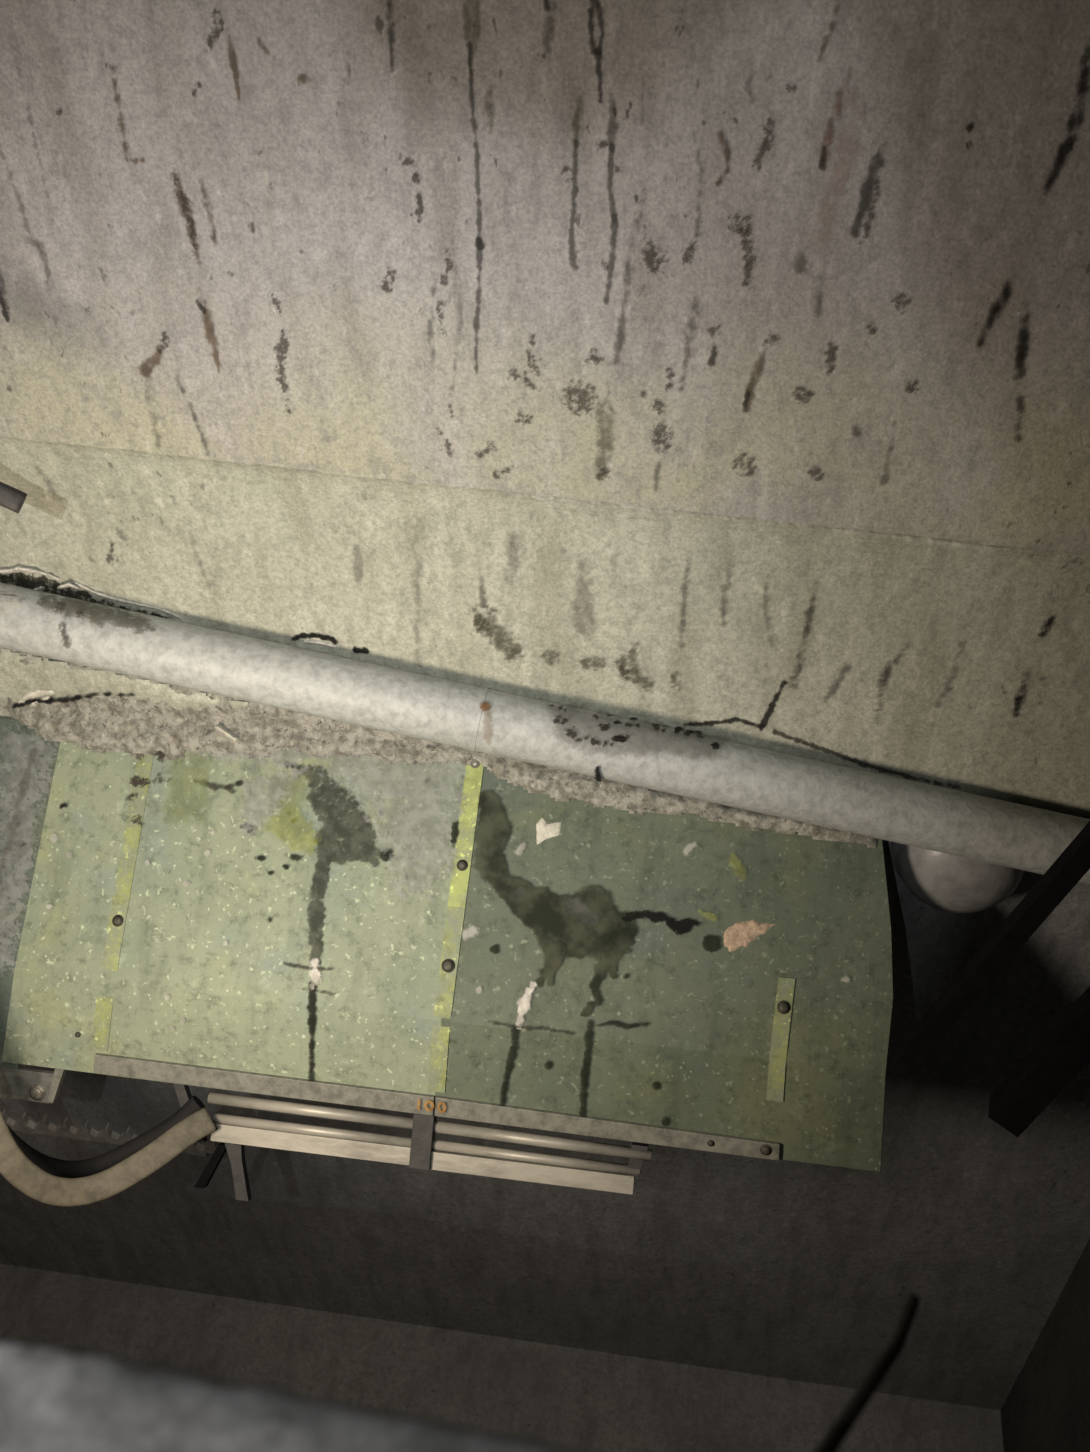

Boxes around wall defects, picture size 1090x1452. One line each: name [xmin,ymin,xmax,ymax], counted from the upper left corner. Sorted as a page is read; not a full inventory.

water stain [1044,49,1090,191]
water stain [172,173,215,258]
water stain [402,158,424,223]
water stain [851,154,882,244]
crack [0,292,9,322]
water stain [140,332,169,377]
water stain [196,301,219,371]
water stain [269,291,290,414]
water stain [641,368,674,453]
crack [686,681,960,788]
water stain [255,759,392,1081]
water stain [450,790,720,1117]